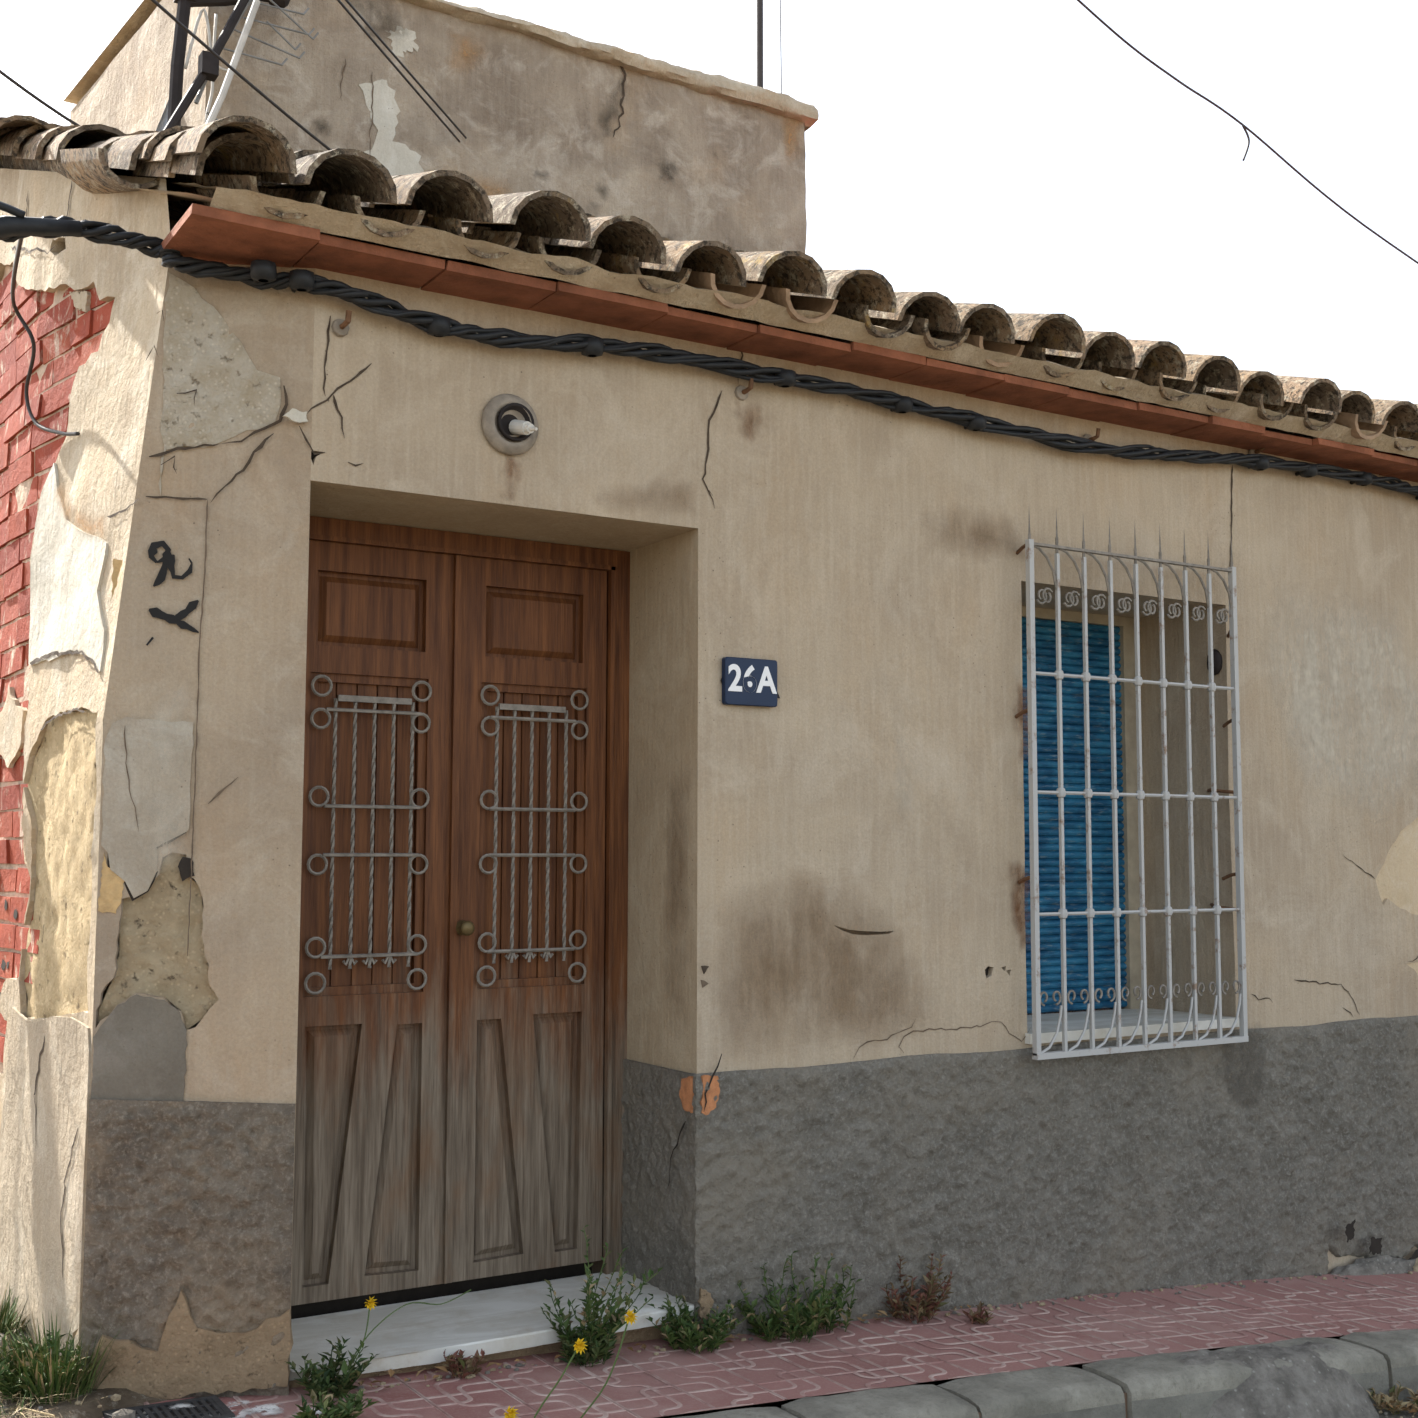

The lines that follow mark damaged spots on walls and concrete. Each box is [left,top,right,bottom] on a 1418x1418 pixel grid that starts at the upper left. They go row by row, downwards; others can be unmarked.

peeling [385,26,419,58]
peeling [359,79,424,176]
crack [702,391,722,508]
flaking render [0,266,219,1030]
crack [107,316,372,956]
spalling [1344,817,1418,915]
crack [34,1038,45,1152]
spalling [668,1053,722,1186]
crack [853,1019,1030,1059]
crack [1252,980,1360,1018]
crack [60,1129,78,1278]
spalling [1328,1237,1418,1276]